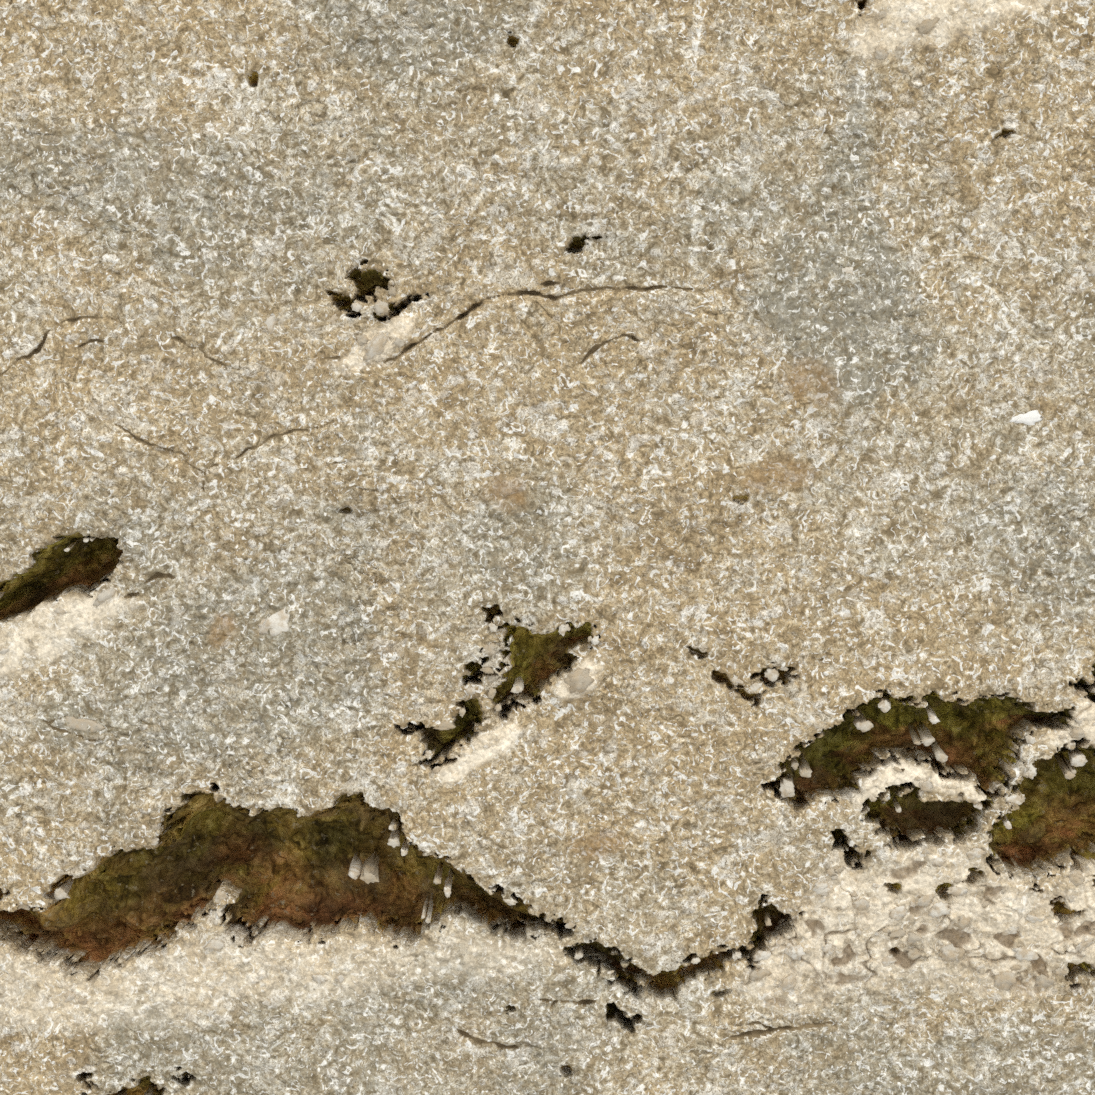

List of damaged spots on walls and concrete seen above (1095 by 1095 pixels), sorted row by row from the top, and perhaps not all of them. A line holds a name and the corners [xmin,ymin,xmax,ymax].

spalling [850,0,1074,64]
spalling [328,260,421,372]
crack [384,281,693,364]
spalling [0,532,128,681]
spalling [398,604,603,787]
spalling [0,783,576,1034]
spalling [711,663,1095,1017]